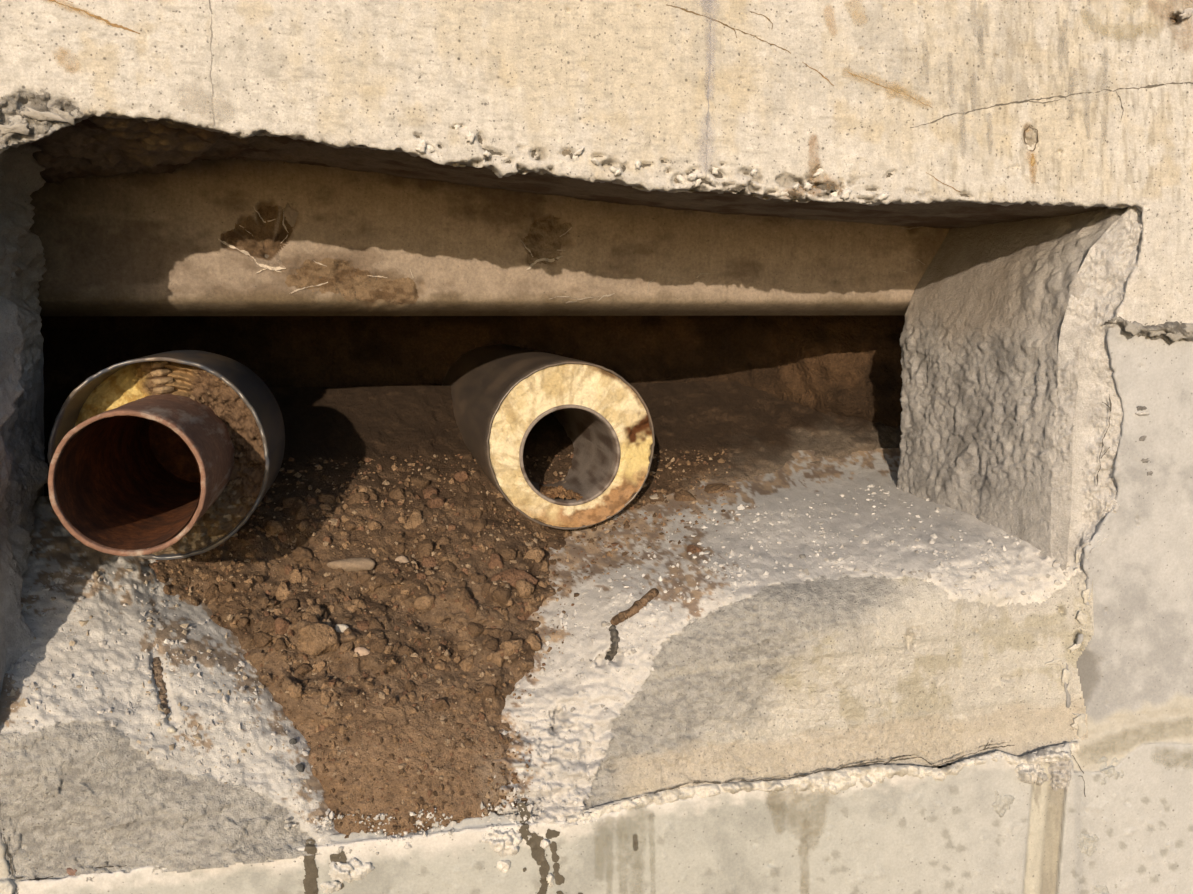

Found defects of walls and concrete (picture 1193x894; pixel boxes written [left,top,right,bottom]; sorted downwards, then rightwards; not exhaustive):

crack [666,0,1193,178]
spalling [0,89,87,149]
spalling [415,135,442,153]
spalling [454,125,511,164]
spalling [562,146,724,188]
spalling [766,168,852,200]
spalling [866,173,894,201]
spalling [218,203,419,305]
spalling [521,215,572,270]
rust [604,588,659,661]
crack [583,743,1015,815]